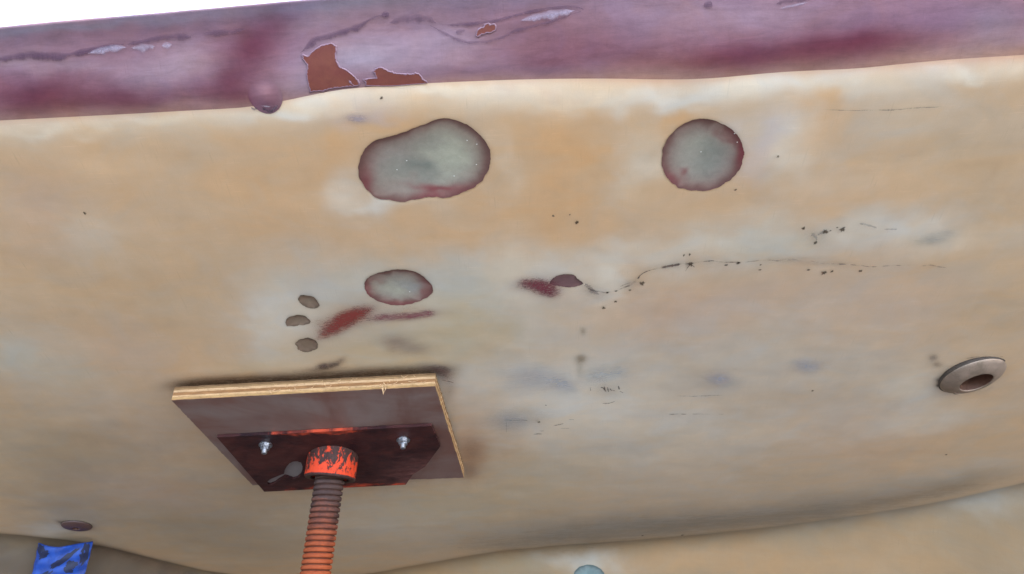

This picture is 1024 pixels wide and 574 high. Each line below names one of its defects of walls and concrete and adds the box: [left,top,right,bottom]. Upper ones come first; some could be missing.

peeling [302,43,428,93]
crack [585,253,762,309]